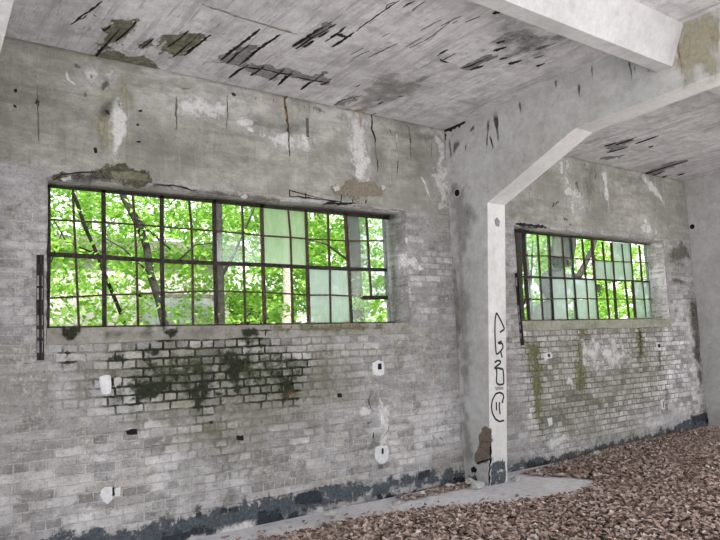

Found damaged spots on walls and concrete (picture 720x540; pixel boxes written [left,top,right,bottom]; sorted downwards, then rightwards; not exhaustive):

spalling [75,18,211,90]
spalling [212,29,331,90]
spalling [292,22,355,49]
leakage [677,12,719,75]
leakage [99,84,128,156]
spalling [52,163,196,191]
crack [283,96,291,156]
peeling [289,176,385,206]
leakage [347,112,371,182]
peeling [581,337,632,371]
leakage [533,353,543,436]
peeling [41,413,709,540]